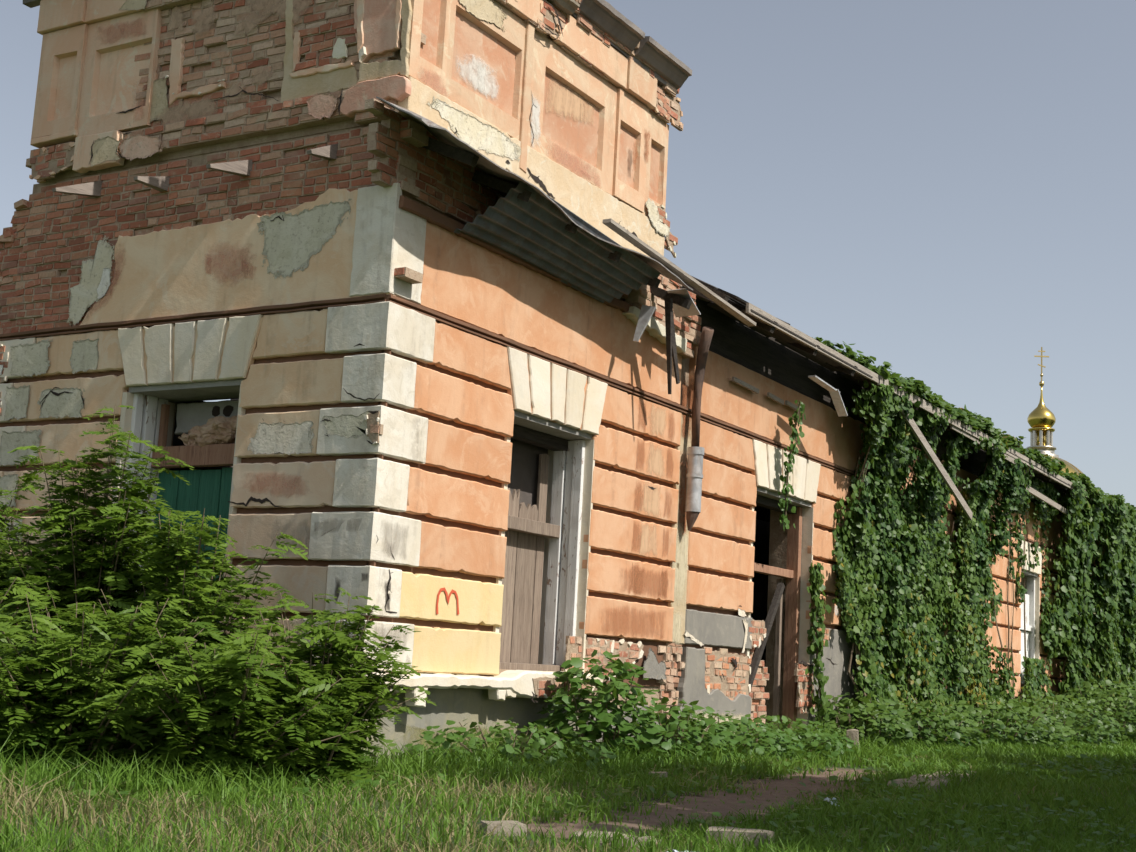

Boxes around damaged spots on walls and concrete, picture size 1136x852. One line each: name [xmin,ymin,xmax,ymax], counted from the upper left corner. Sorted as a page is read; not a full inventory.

peeling [460,0,507,31]
peeling [427,97,521,162]
crack [506,92,555,199]
spalling [0,0,429,542]
crack [40,387,84,409]
crack [228,496,283,508]
spalling [532,636,644,698]
spalling [685,608,767,700]